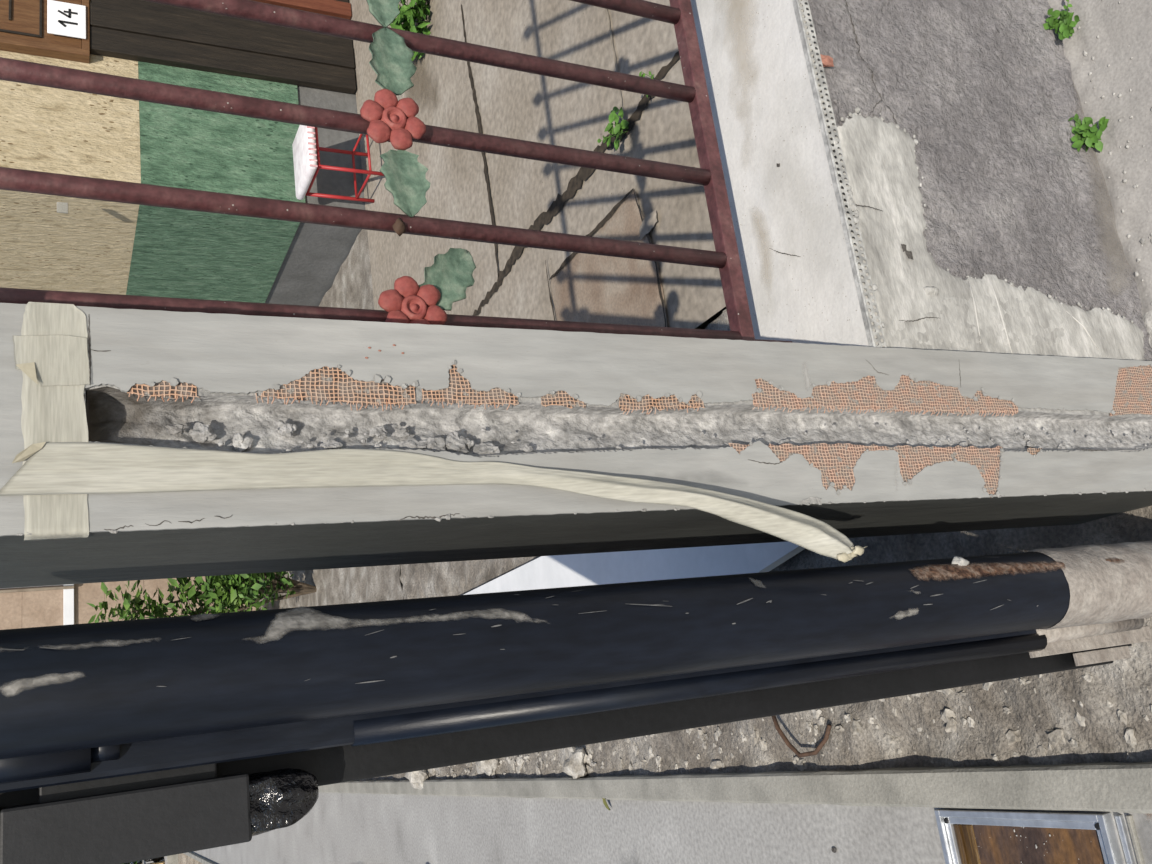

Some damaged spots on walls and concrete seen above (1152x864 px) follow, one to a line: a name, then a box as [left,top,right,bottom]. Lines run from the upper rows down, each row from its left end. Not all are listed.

crack [461,4,680,316]
spalling [127,378,201,403]
spalling [255,360,521,411]
spalling [541,391,586,409]
spalling [619,391,705,415]
spalling [752,373,1018,417]
spalling [1110,364,1152,416]
spalling [769,443,1005,505]